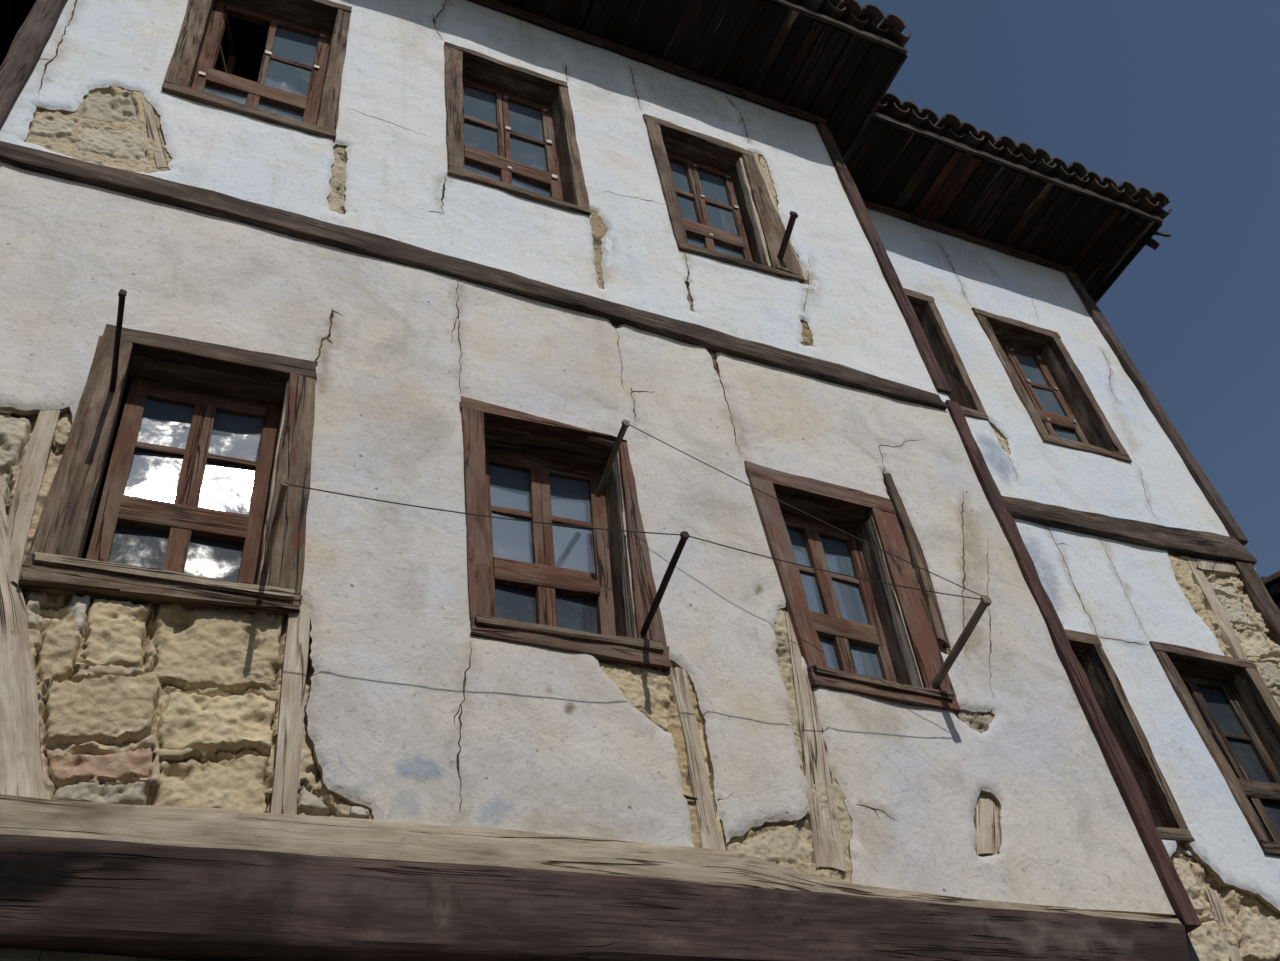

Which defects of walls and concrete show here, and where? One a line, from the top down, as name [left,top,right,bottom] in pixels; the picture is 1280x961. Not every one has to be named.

crack [38,0,77,94]
spalling [25,85,172,173]
spalling [327,146,347,215]
spalling [590,210,608,289]
crack [451,281,462,393]
spalling [0,410,38,519]
spalling [20,410,286,813]
spalling [1168,554,1280,707]
spalling [297,632,372,819]
crack [454,642,472,813]
spalling [599,609,852,883]
spalling [1170,844,1280,961]